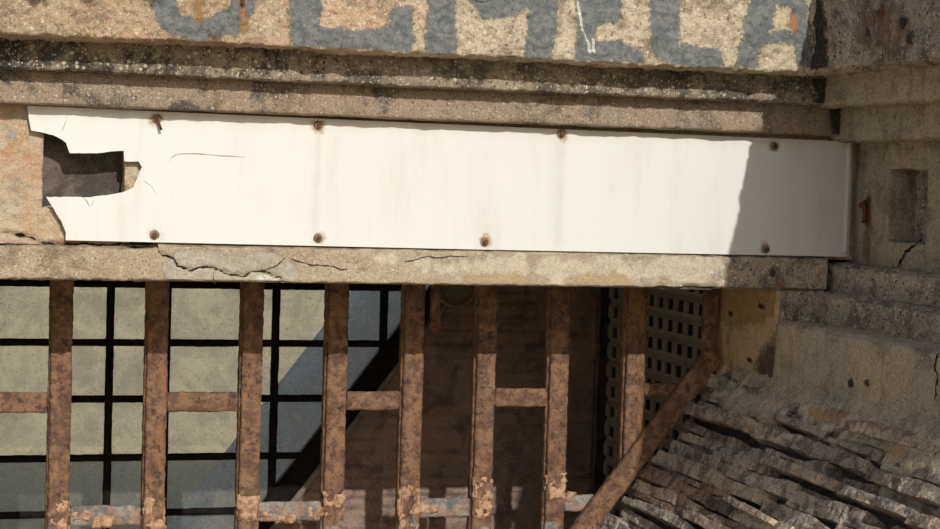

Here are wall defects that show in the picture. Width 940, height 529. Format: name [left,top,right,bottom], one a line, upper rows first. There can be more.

crack [2,232,348,284]
crack [405,254,468,262]
crack [898,240,921,266]
crack [932,353,940,400]